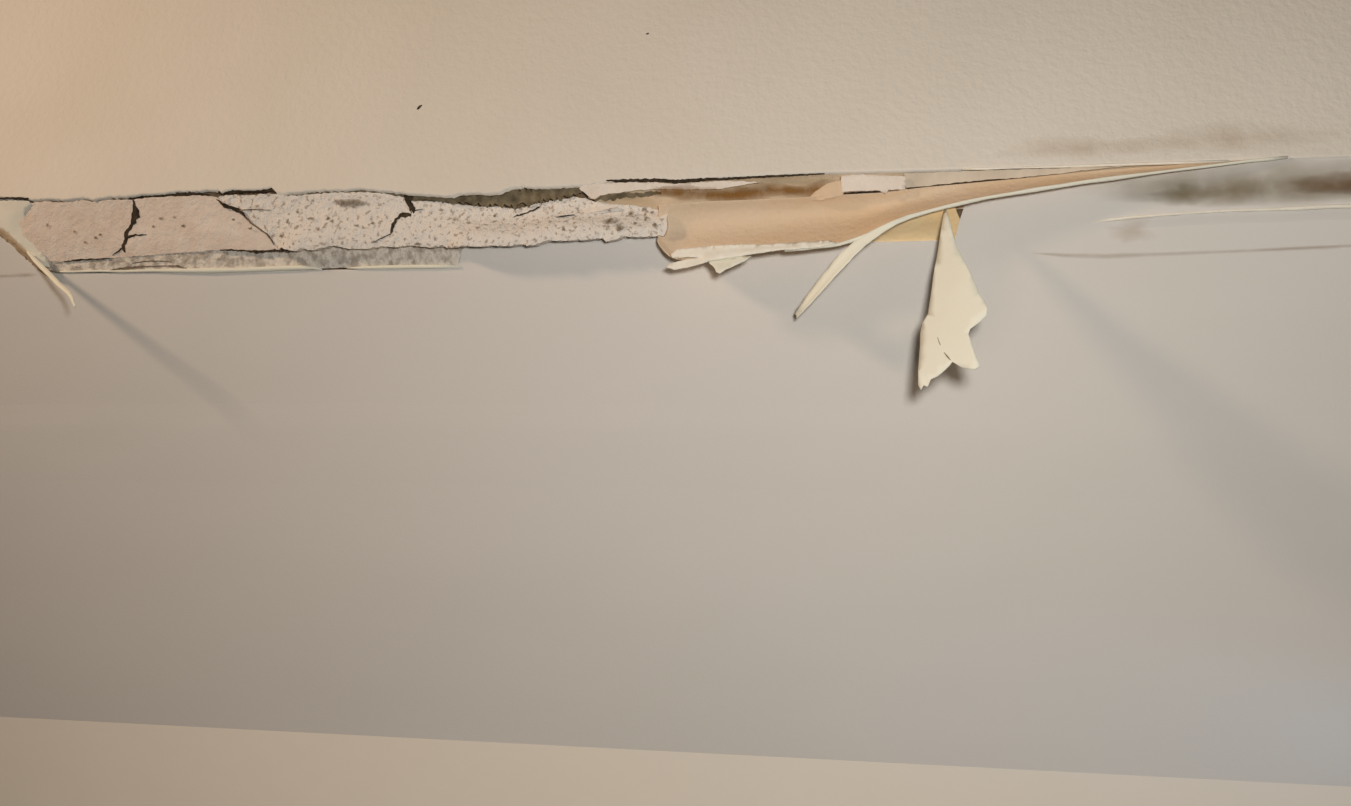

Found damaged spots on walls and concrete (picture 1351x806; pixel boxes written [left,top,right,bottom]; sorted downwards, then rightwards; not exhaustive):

crack [0,173,1026,270]
spalling [0,156,1288,390]